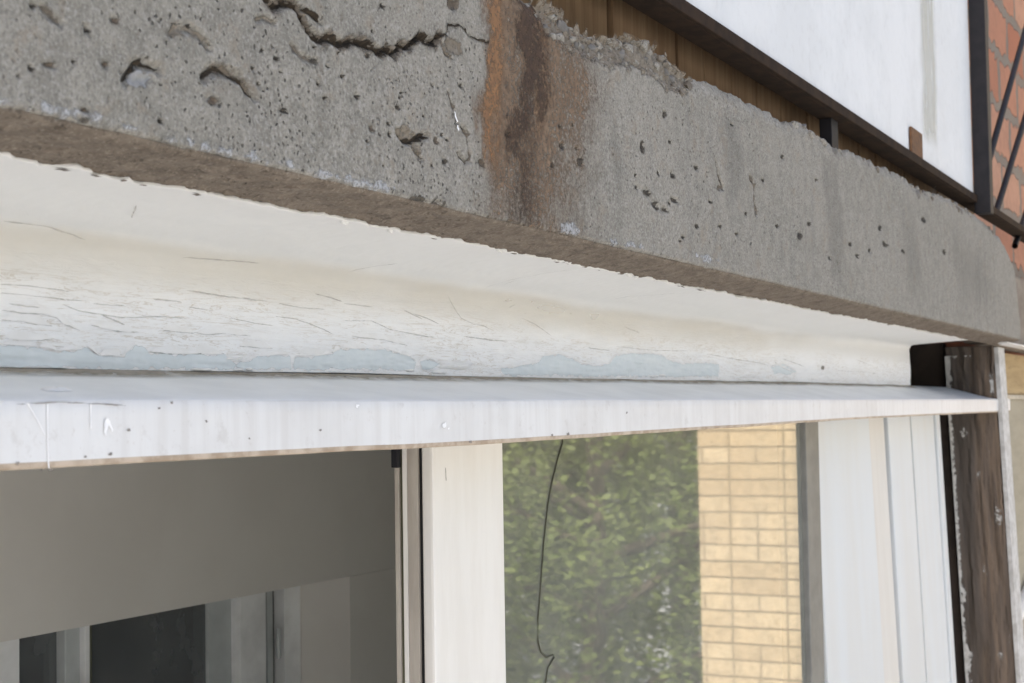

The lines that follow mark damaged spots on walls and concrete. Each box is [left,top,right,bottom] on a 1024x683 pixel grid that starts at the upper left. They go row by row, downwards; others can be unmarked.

crack [263,0,489,60]
spalling [530,0,693,96]
corrosion [477,0,598,236]
crack [2,303,137,356]
peeling [0,340,447,374]
peeling [498,350,719,378]